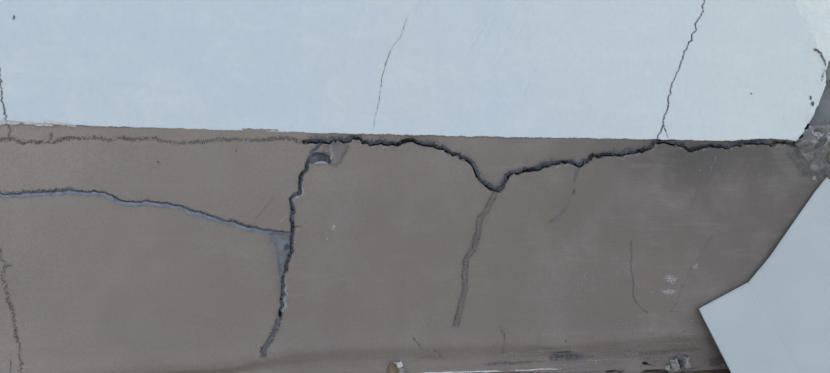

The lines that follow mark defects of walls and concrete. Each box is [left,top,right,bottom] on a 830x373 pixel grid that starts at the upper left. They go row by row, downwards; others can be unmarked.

crack [672,0,705,83]
spalling [784,0,830,188]
crack [0,68,804,373]